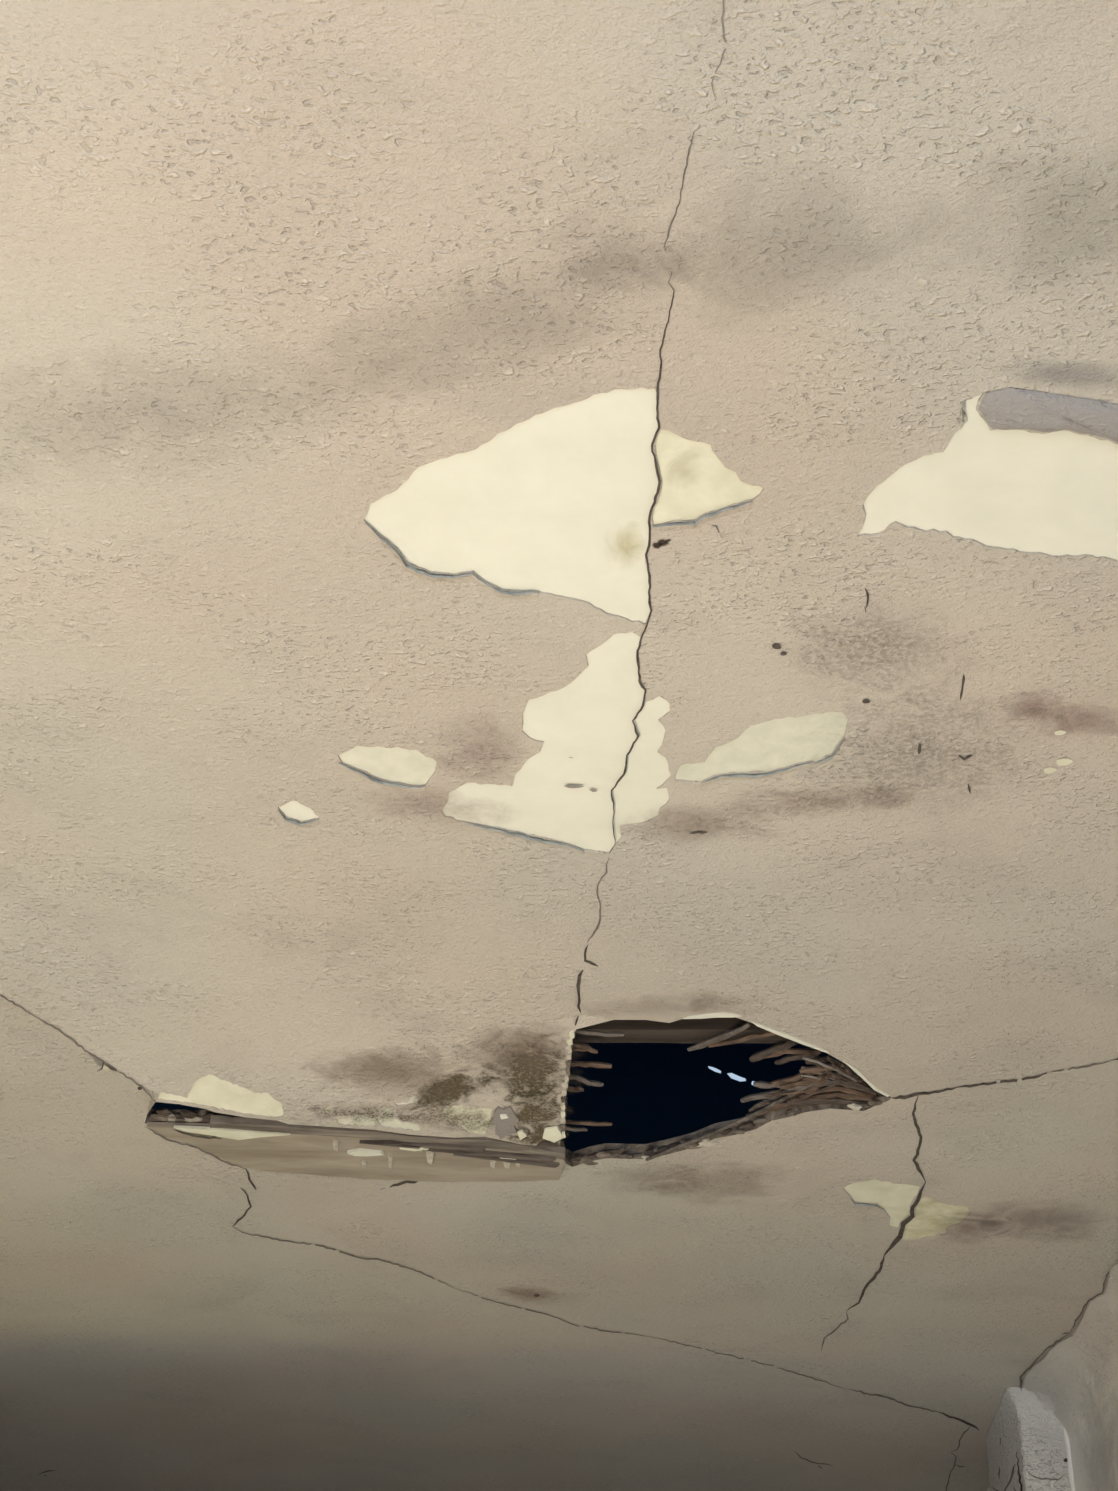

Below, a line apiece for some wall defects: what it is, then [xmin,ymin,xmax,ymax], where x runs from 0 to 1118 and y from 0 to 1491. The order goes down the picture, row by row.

crack [711,0,726,101]
peeling [859,394,1118,560]
peeling [365,387,848,855]
crack [564,132,694,1025]
crack [958,674,966,700]
peeling [339,746,437,792]
crack [952,755,973,794]
spalling [147,1030,649,1182]
leakage [316,1043,572,1144]
spalling [683,1012,889,1111]
crack [0,994,1118,1491]
peeling [844,1179,970,1240]